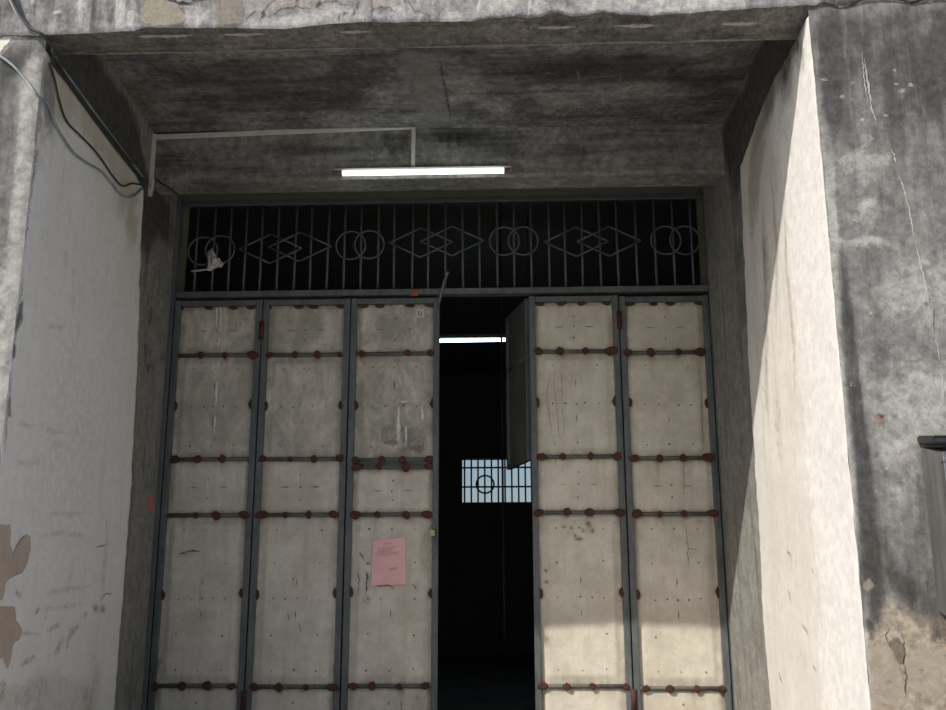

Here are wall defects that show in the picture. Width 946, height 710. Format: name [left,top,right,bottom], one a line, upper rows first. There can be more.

crack [862,52,876,121]
crack [891,149,945,409]
peeling [0,525,31,668]